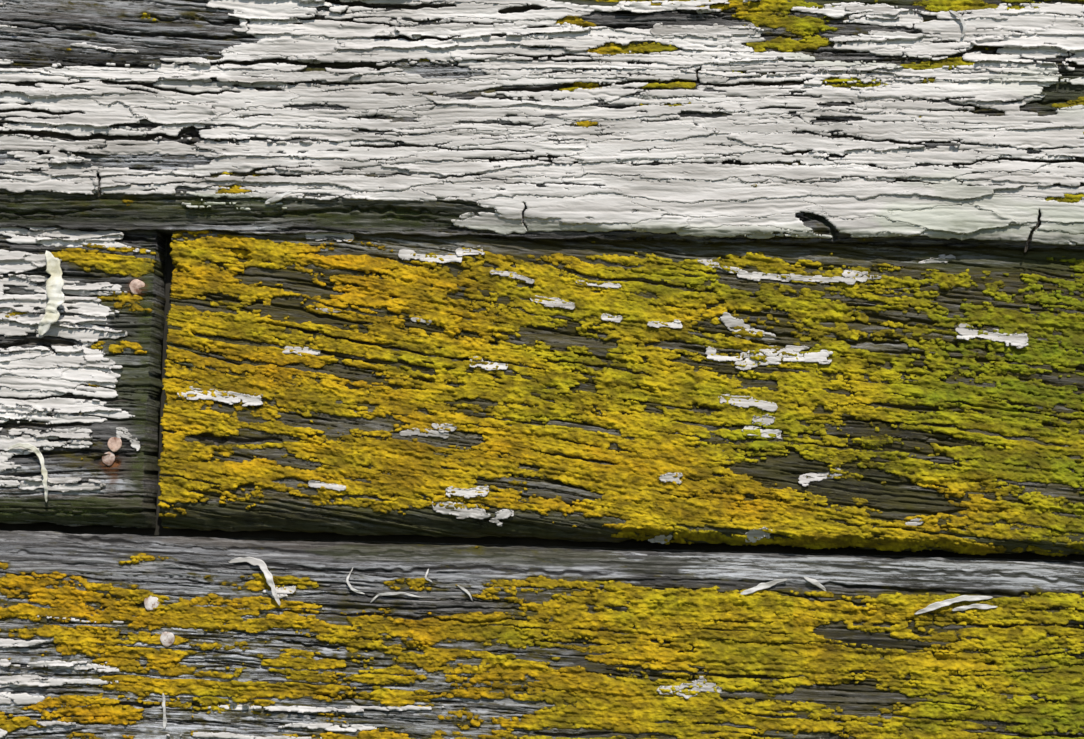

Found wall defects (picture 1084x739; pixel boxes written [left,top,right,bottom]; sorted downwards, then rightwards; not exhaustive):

peeling [0,0,1084,246]
crack [781,149,808,157]
crack [831,136,1084,165]
crack [1025,209,1041,252]
peeling [398,246,485,263]
peeling [0,226,151,492]
peeling [705,312,833,370]
peeling [955,324,1029,349]
peeling [177,386,263,406]
peeling [432,486,514,526]
peeling [0,638,119,704]
peeling [166,704,444,739]